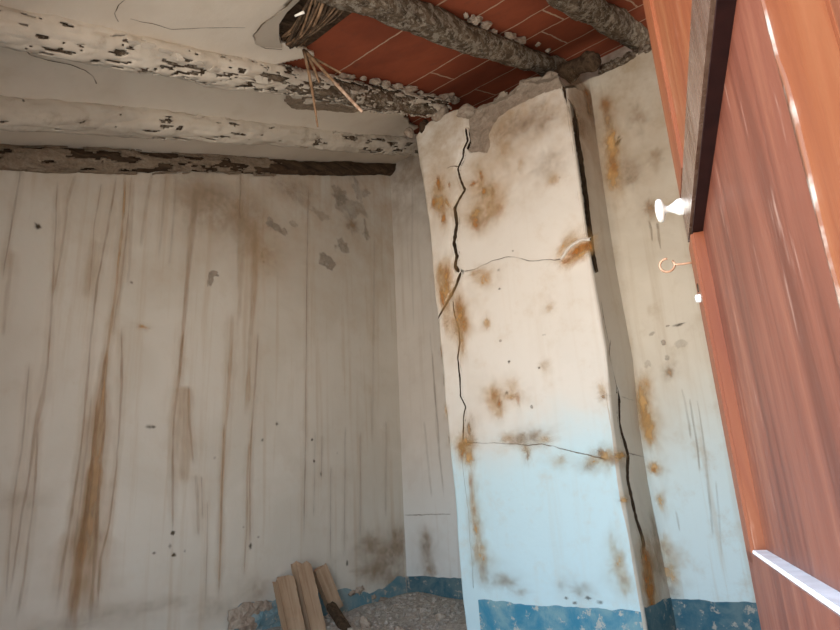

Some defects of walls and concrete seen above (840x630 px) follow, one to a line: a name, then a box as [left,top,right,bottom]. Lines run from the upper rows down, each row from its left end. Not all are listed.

peeling [254,0,300,48]
spalling [237,75,370,113]
spalling [465,78,563,155]
crack [562,86,598,273]
corrosion [565,243,592,263]
crack [438,127,560,584]
corrosion [639,387,654,439]
crack [501,443,604,459]
crack [614,376,646,560]